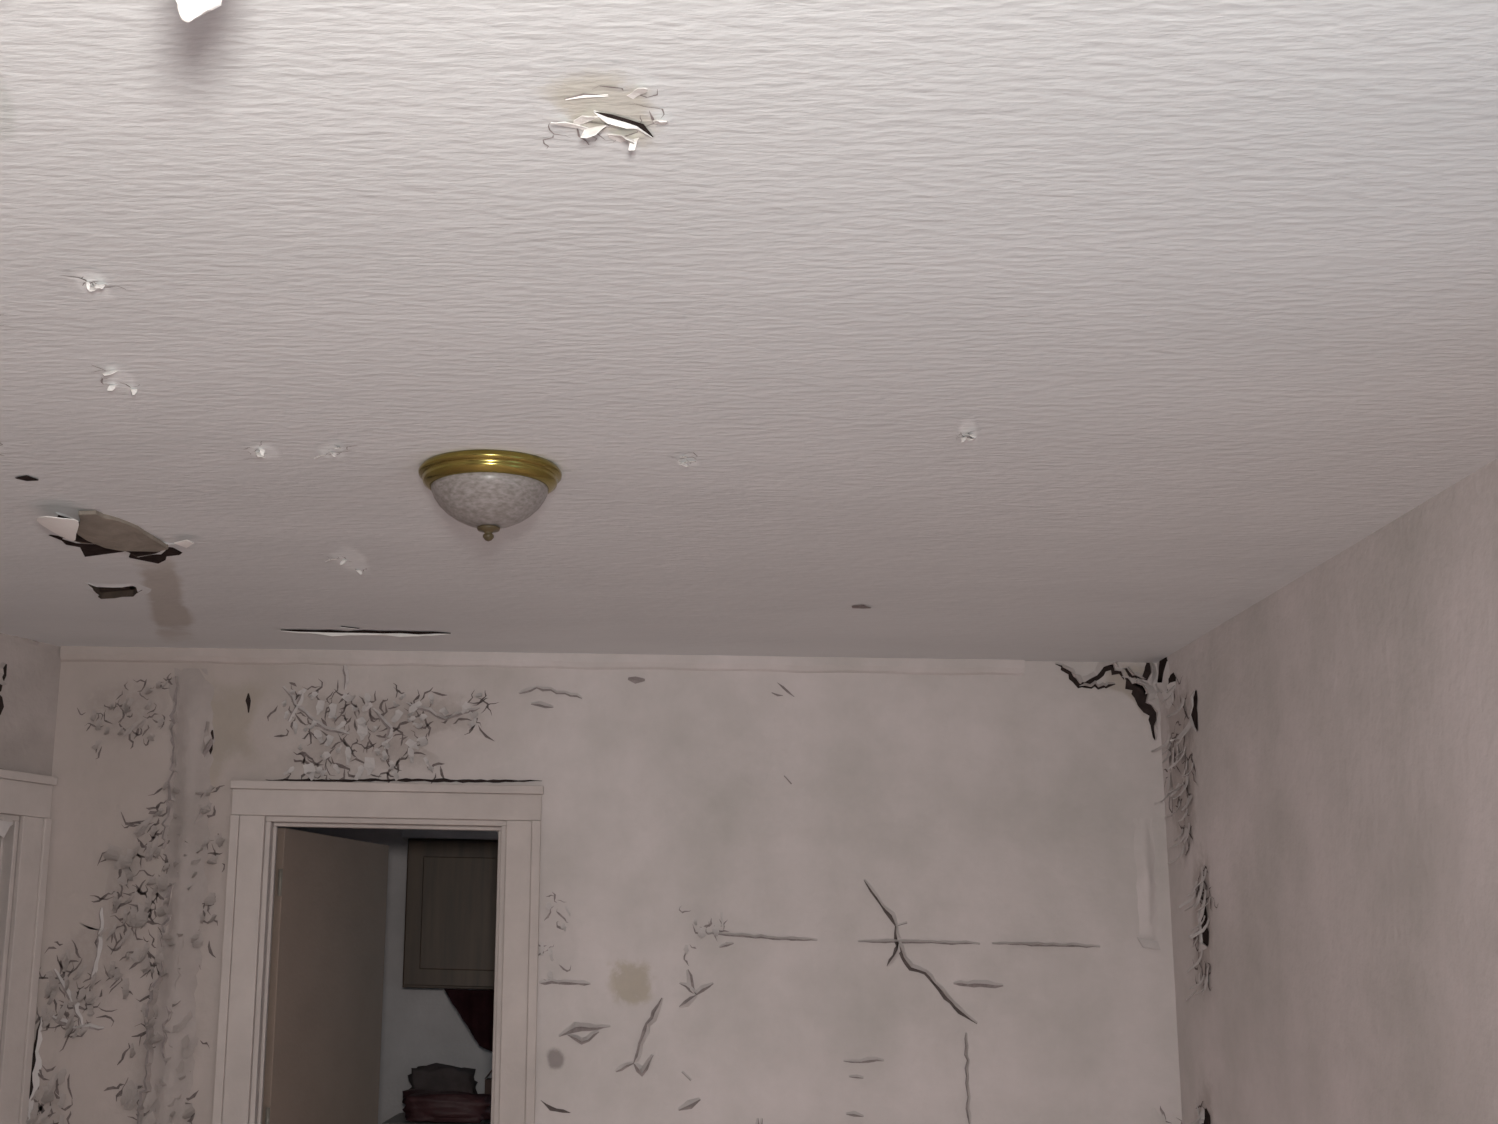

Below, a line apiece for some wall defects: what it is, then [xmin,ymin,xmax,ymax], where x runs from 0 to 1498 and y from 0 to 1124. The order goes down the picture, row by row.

spalling [523,60,675,157]
crack [0,662,8,715]
crack [1056,657,1198,740]
crack [1197,906,1209,952]
crack [27,908,104,1121]
crack [539,978,590,986]
crack [559,932,817,1111]
crack [858,879,1100,1124]
crack [542,1101,570,1113]
crack [843,1057,884,1117]
crack [1196,1102,1210,1124]